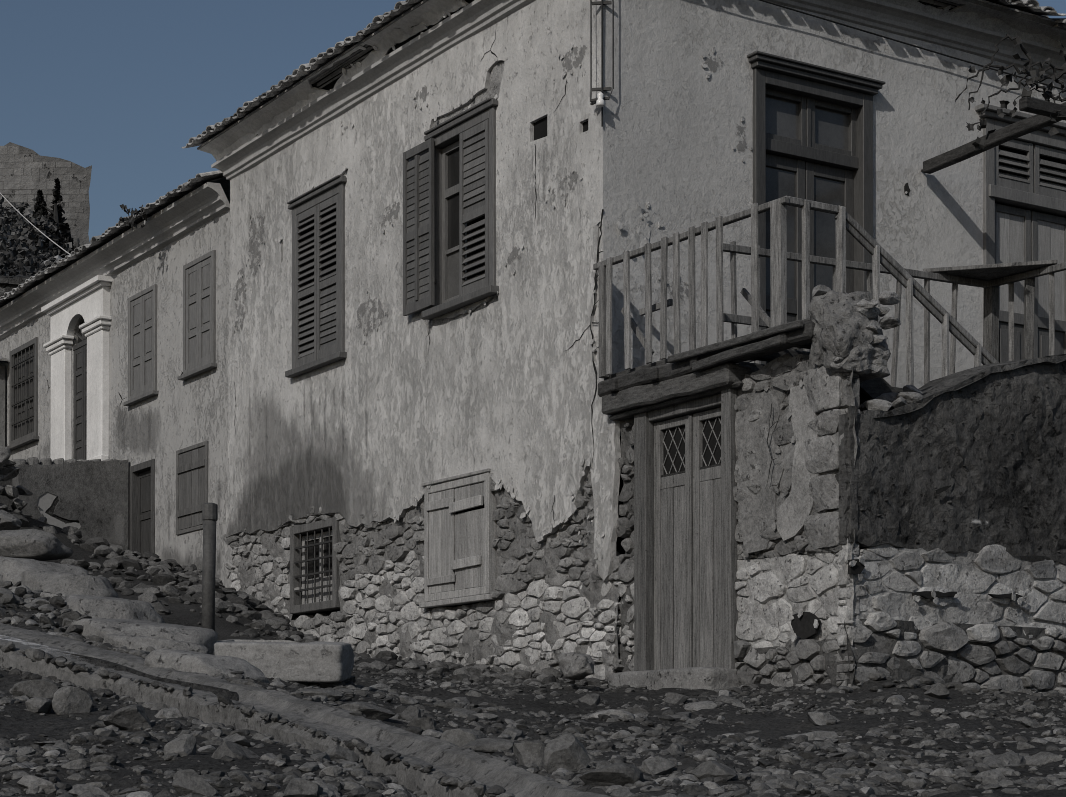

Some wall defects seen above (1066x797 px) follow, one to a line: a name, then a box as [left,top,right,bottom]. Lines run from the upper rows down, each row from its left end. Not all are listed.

flaking render [387,1,470,54]
flaking render [558,43,587,79]
crack [565,209,604,468]
flaking render [223,457,624,682]